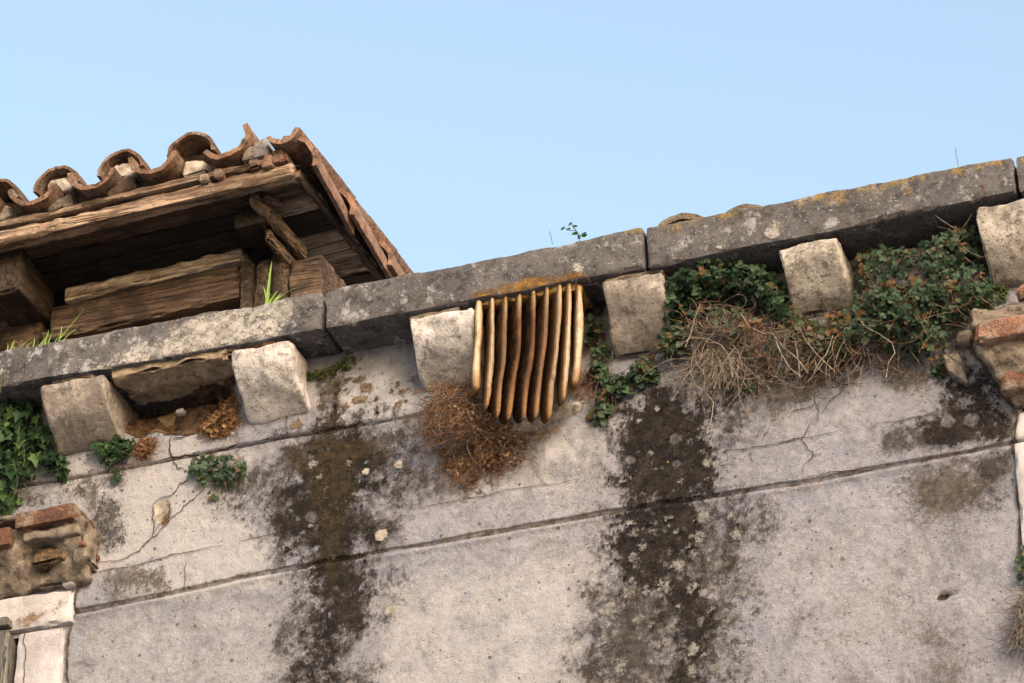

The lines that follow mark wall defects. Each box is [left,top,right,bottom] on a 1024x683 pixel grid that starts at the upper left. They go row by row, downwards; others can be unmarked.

spalling [124,377,237,439]
crack [65,415,371,683]
leakage [214,403,492,683]
leakage [563,365,859,683]
crack [709,382,883,486]
crack [877,402,968,424]
leakage [870,353,1024,529]